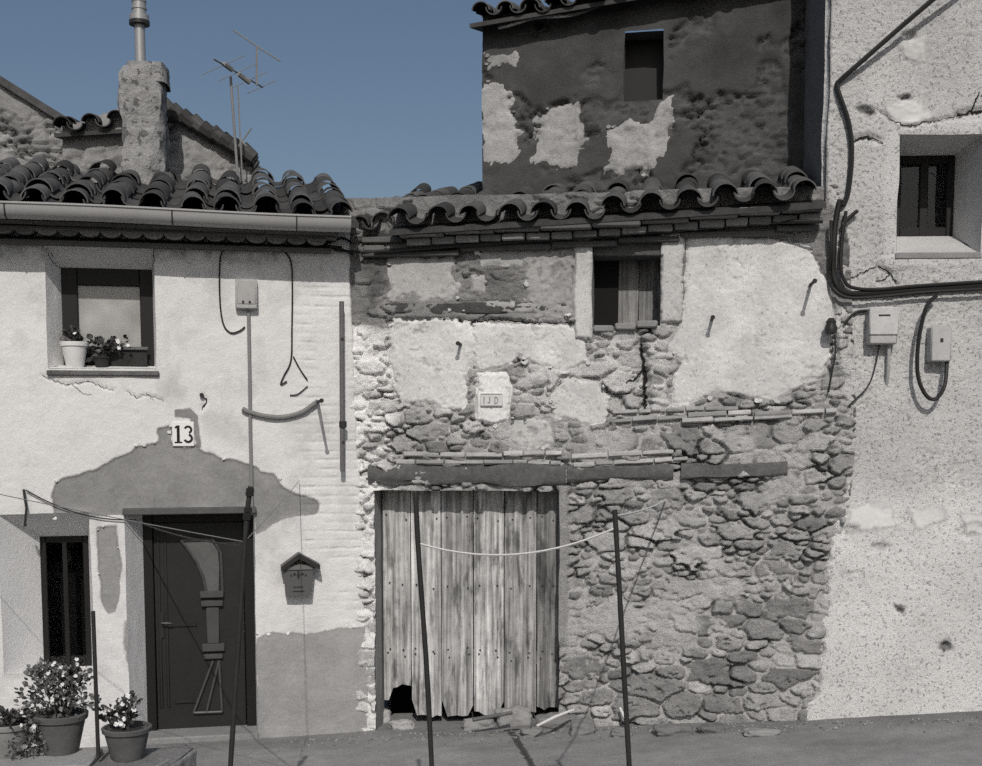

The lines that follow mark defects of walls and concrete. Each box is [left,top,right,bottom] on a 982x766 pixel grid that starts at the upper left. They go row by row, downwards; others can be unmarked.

flaking render [482,50,589,170]
flaking render [603,95,675,177]
crack [854,94,982,144]
flaking render [385,241,610,450]